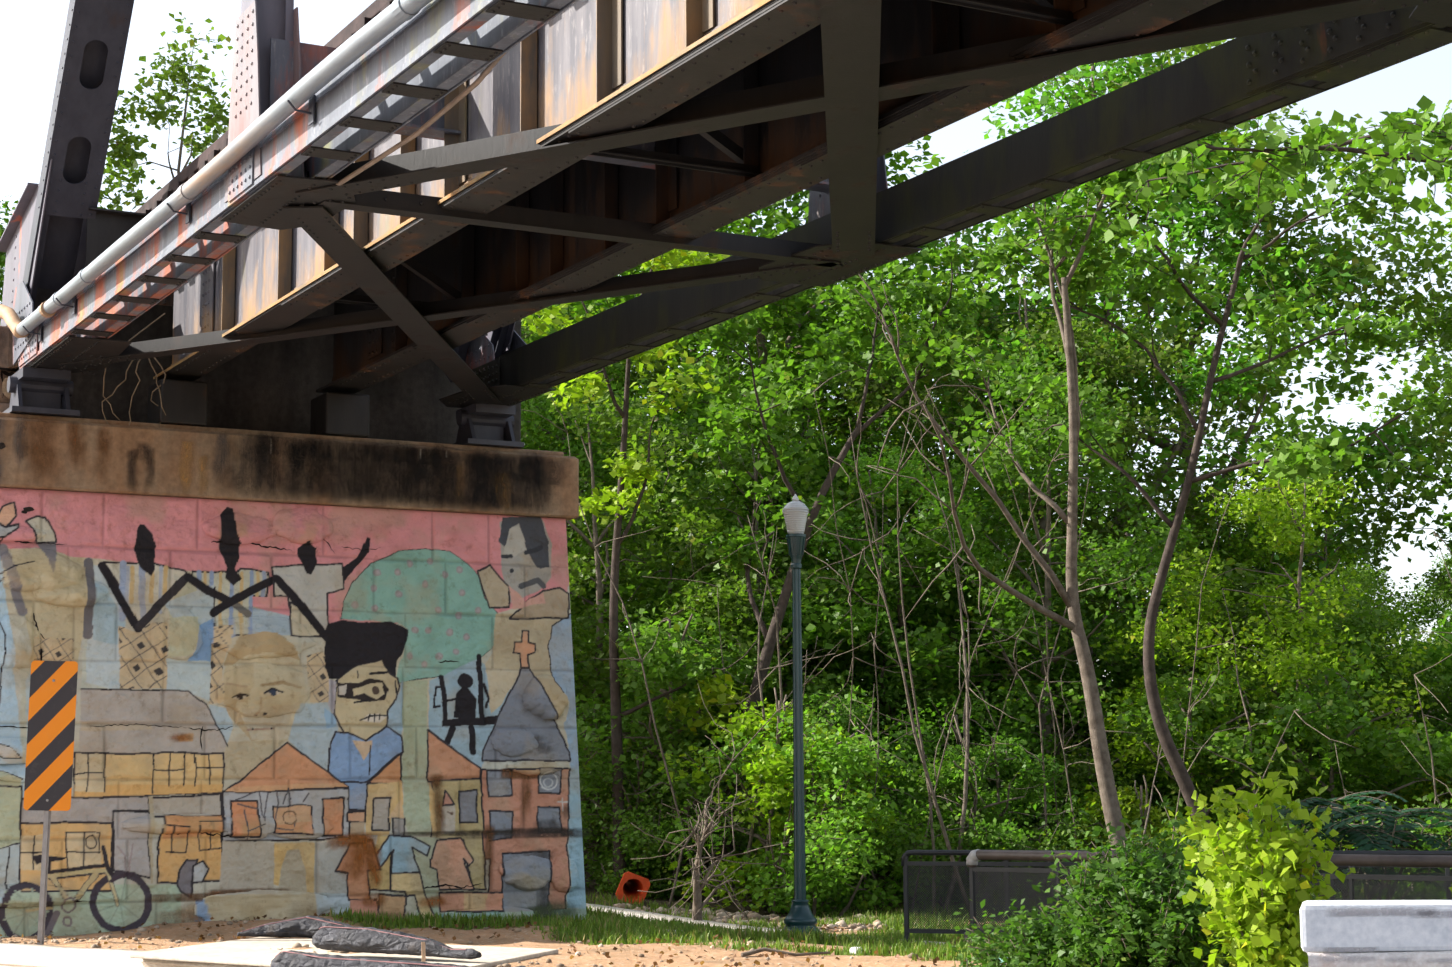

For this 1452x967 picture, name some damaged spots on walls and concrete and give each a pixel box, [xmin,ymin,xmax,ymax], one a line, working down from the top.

leakage [216,434,556,507]